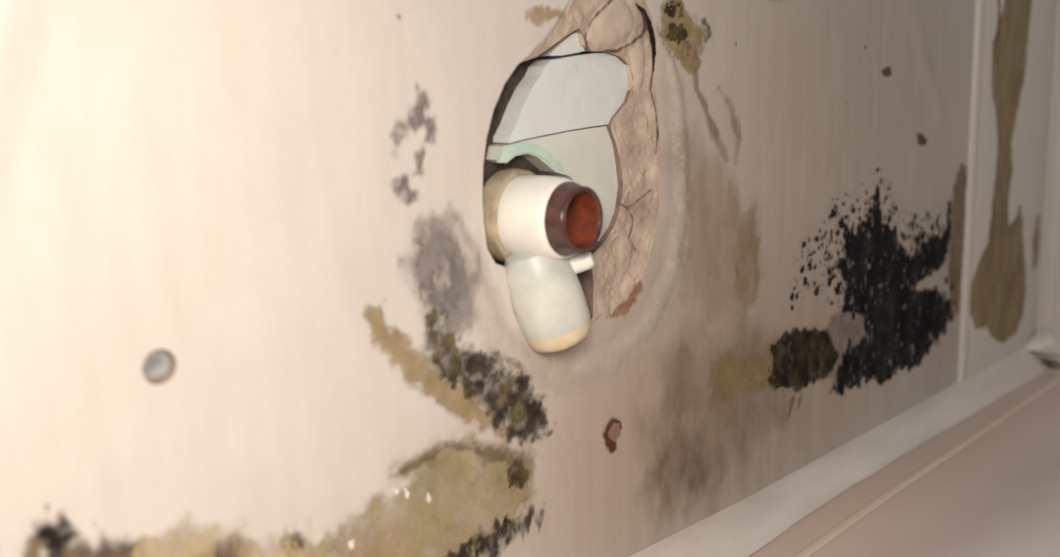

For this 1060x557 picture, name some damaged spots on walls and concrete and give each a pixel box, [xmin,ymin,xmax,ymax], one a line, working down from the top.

damp [394,176,416,203]
damp [394,93,435,174]
flaking render [486,0,660,324]
damp [660,0,718,140]
damp [712,0,1032,416]
damp [24,220,551,557]
corrosion [603,418,622,453]